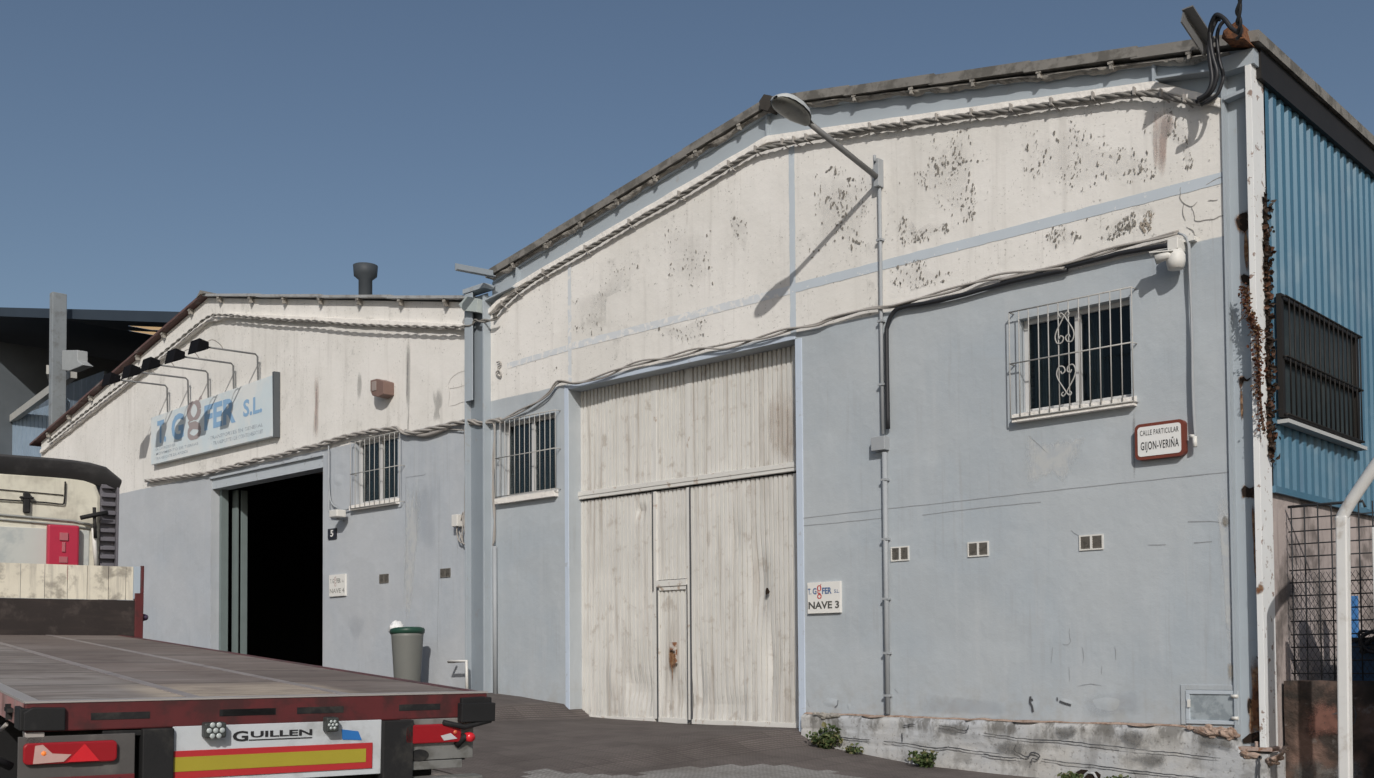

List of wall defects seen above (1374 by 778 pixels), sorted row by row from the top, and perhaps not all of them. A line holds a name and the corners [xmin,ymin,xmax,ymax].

corrosion [1236,216,1249,269]
spalling [1186,724,1291,766]
corrosion [1242,656,1260,743]
peeling [1309,704,1338,736]